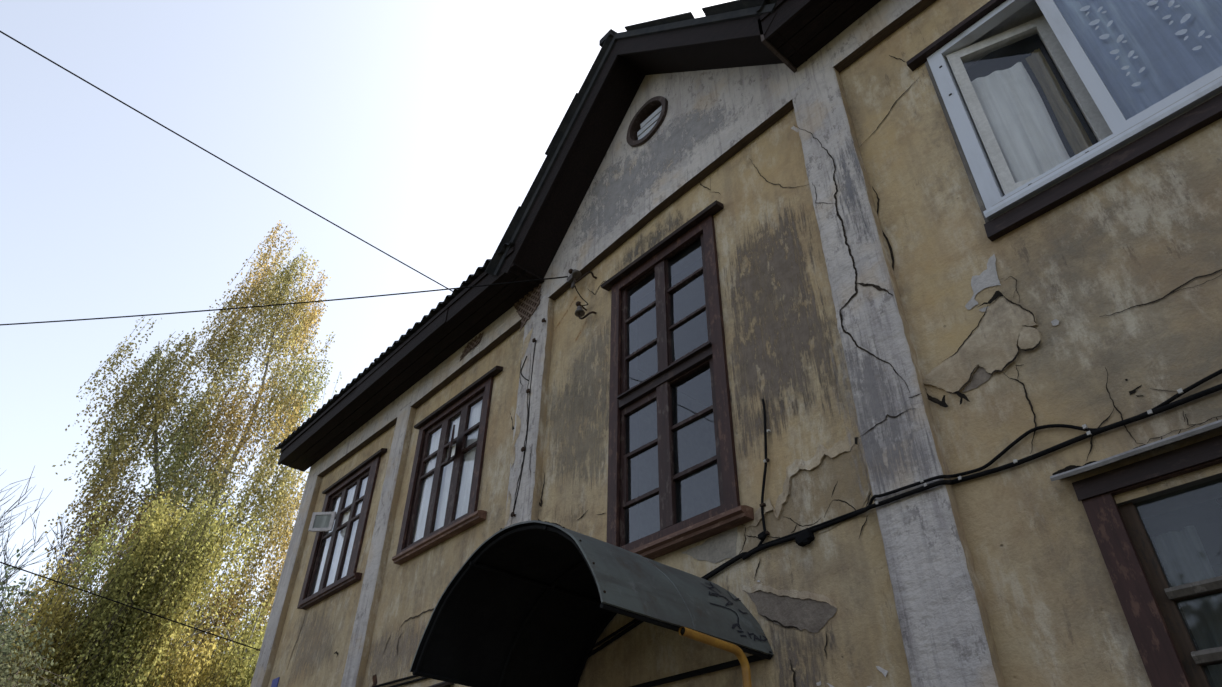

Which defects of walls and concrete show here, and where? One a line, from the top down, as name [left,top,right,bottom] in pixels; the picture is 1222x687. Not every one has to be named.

crack [750,55,1041,473]
peeling [965,255,1001,312]
crack [1099,269,1222,317]
damp [725,209,935,491]
spalling [963,366,992,392]
spalling [682,427,870,563]
spalling [741,580,837,633]